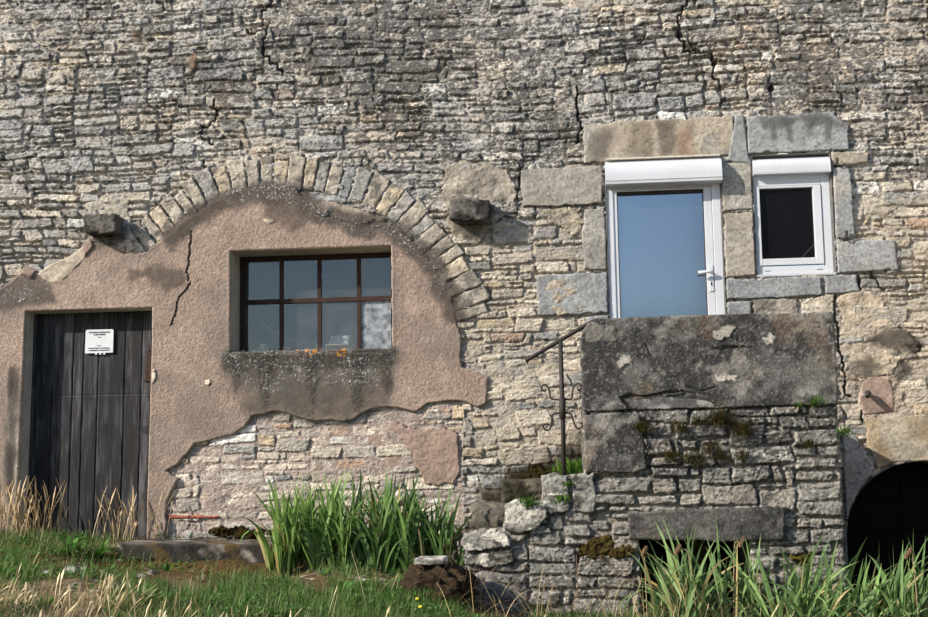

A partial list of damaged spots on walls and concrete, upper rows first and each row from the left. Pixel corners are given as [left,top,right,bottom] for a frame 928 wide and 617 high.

crack [248,0,284,75]
crack [676,0,727,88]
leakage [130,267,184,290]
leakage [228,350,397,423]
leakage [4,367,17,530]
flaking render [166,401,466,569]